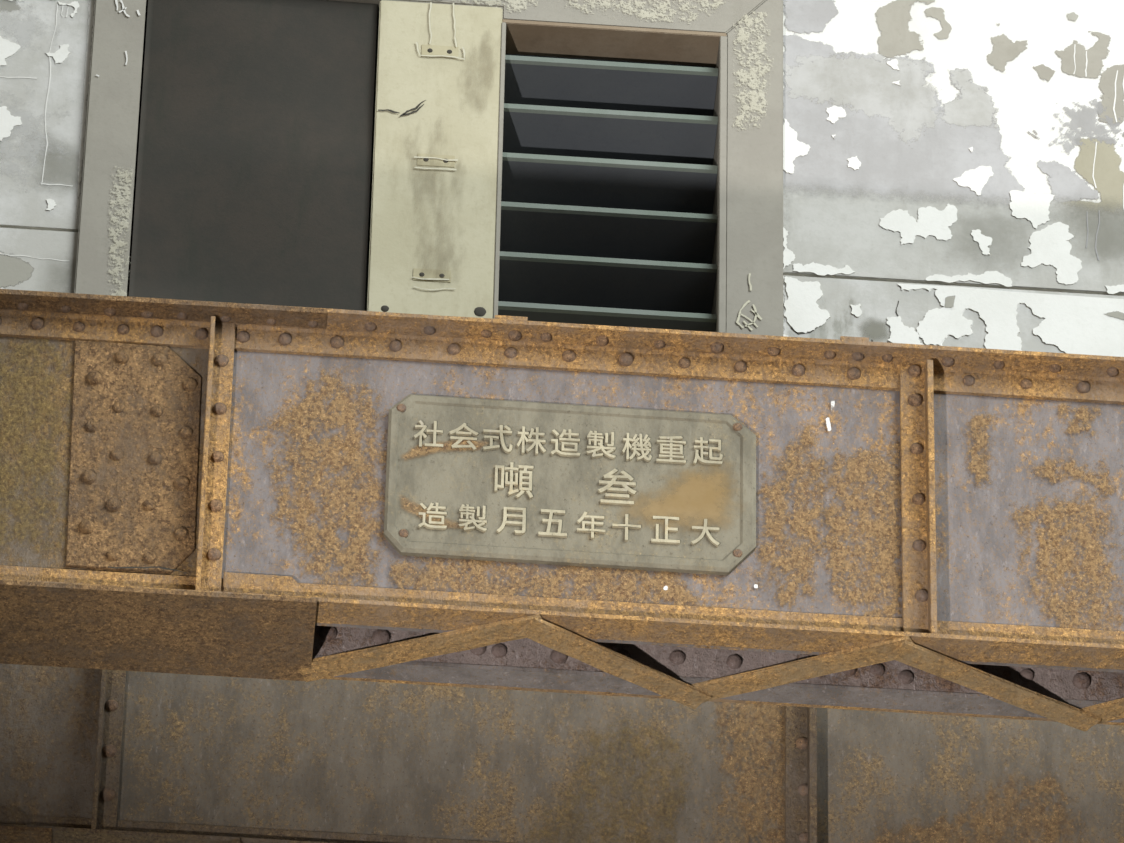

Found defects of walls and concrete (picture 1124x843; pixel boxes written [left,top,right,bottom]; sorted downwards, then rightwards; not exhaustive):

peeling [0,0,93,293]
crack [378,100,426,117]
peeling [783,0,1124,357]
rust [263,368,710,607]
rust [630,472,730,527]
rust [754,425,902,618]
rust [961,414,996,486]
rust [1012,457,1124,631]
rust [1058,402,1101,438]